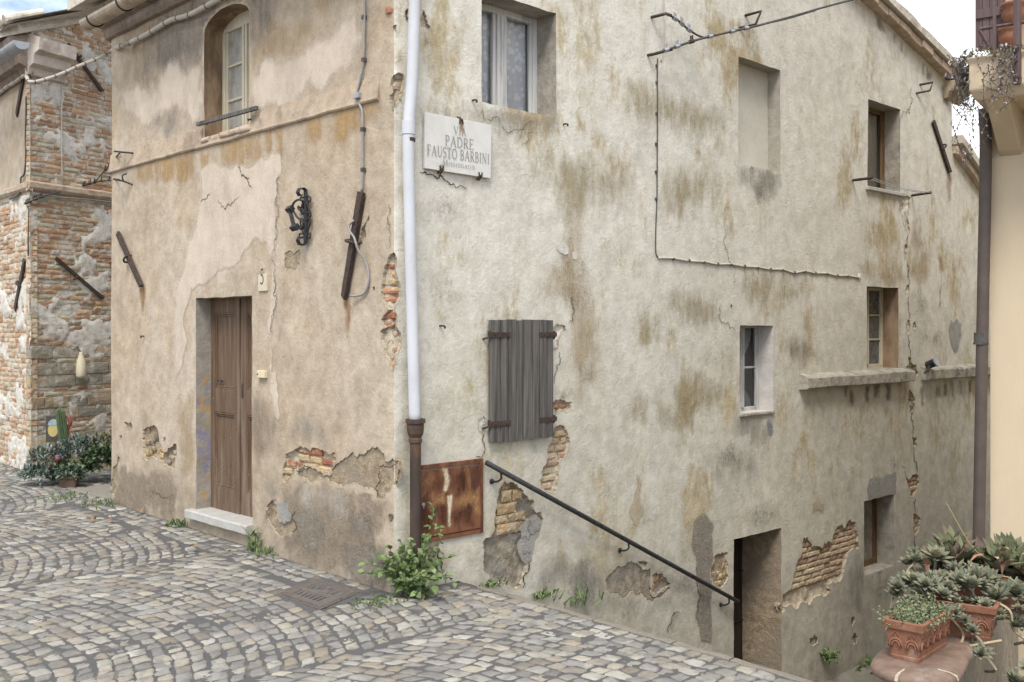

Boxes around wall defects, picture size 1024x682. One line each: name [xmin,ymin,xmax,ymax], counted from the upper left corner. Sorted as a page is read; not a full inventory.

spalling [380,252,402,371]
spalling [110,421,177,514]
peeling [282,445,403,499]
spalling [539,398,572,494]
peeling [266,501,297,537]
spalling [483,481,544,590]
peeling [605,560,671,602]
spalling [710,552,729,589]
spalling [775,519,860,613]